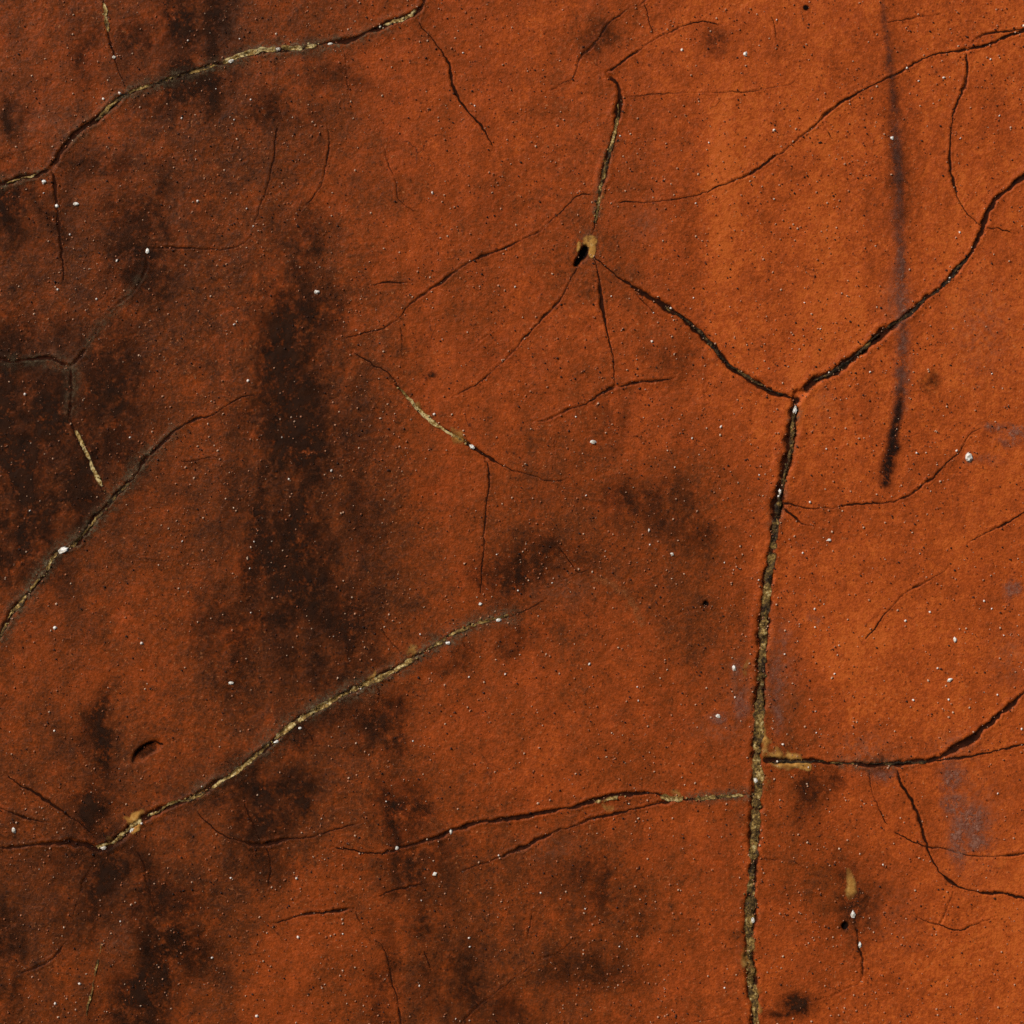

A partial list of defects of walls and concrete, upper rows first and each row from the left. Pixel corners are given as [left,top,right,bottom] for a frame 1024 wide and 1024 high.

crack [0,0,492,286]
water stain [0,325,140,579]
crack [0,349,252,640]
water stain [242,264,365,678]
crack [335,0,1024,1024]
water stain [881,366,903,486]
crack [86,943,102,1015]
water stain [74,696,206,1024]
crack [0,601,542,885]
water stain [230,766,314,868]
crack [276,908,359,923]
water stain [382,791,428,883]